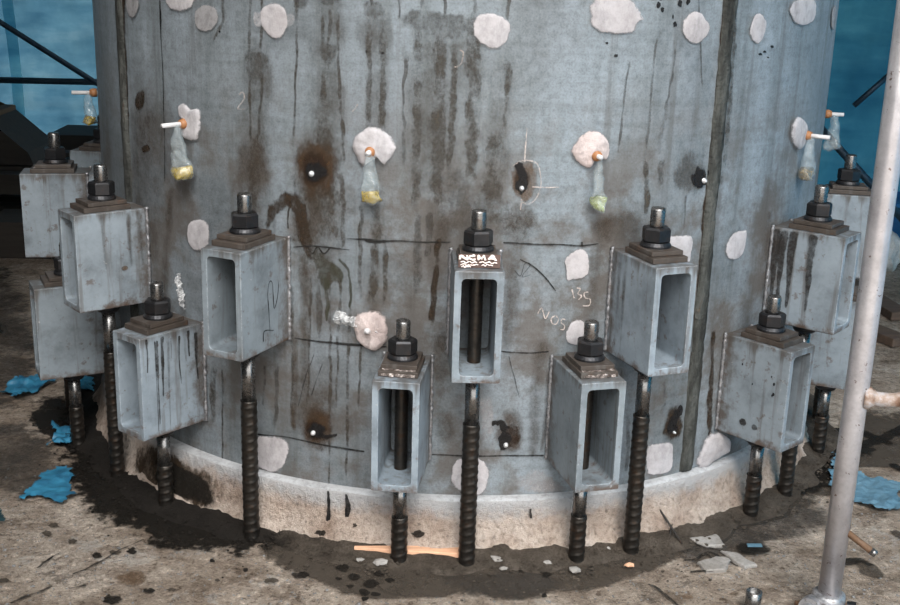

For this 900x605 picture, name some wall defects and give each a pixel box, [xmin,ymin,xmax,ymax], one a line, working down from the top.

water stain [366,59,386,125]
water stain [402,41,481,195]
corrosion [267,144,336,259]
corrosion [292,389,330,450]
corrosion [499,414,520,450]